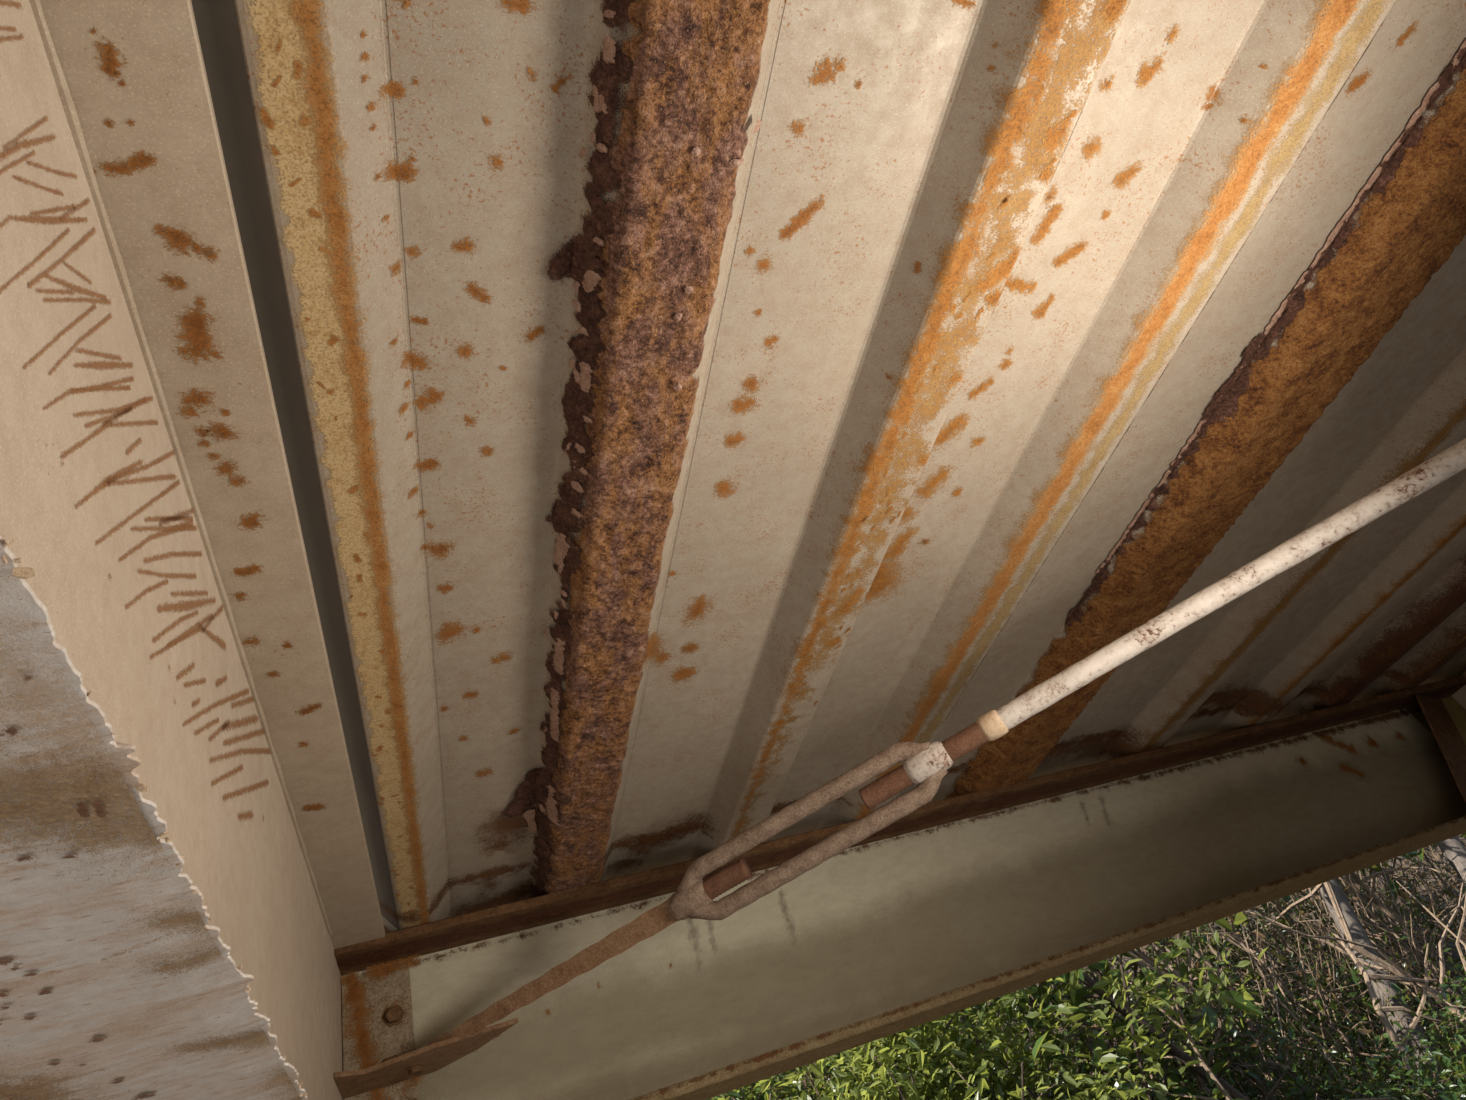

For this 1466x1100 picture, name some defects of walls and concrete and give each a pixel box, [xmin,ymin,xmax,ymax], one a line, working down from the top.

corrosion [90,27,127,87]
peeling [602,9,616,64]
peeling [592,84,608,114]
peeling [590,132,608,153]
corrosion [152,224,223,365]
peeling [572,269,602,336]
peeling [569,358,593,393]
corrosion [897,0,1395,744]
corrosion [176,387,251,488]
peeling [564,442,588,518]
corrosion [271,0,1131,1069]
corrosion [840,515,1466,855]